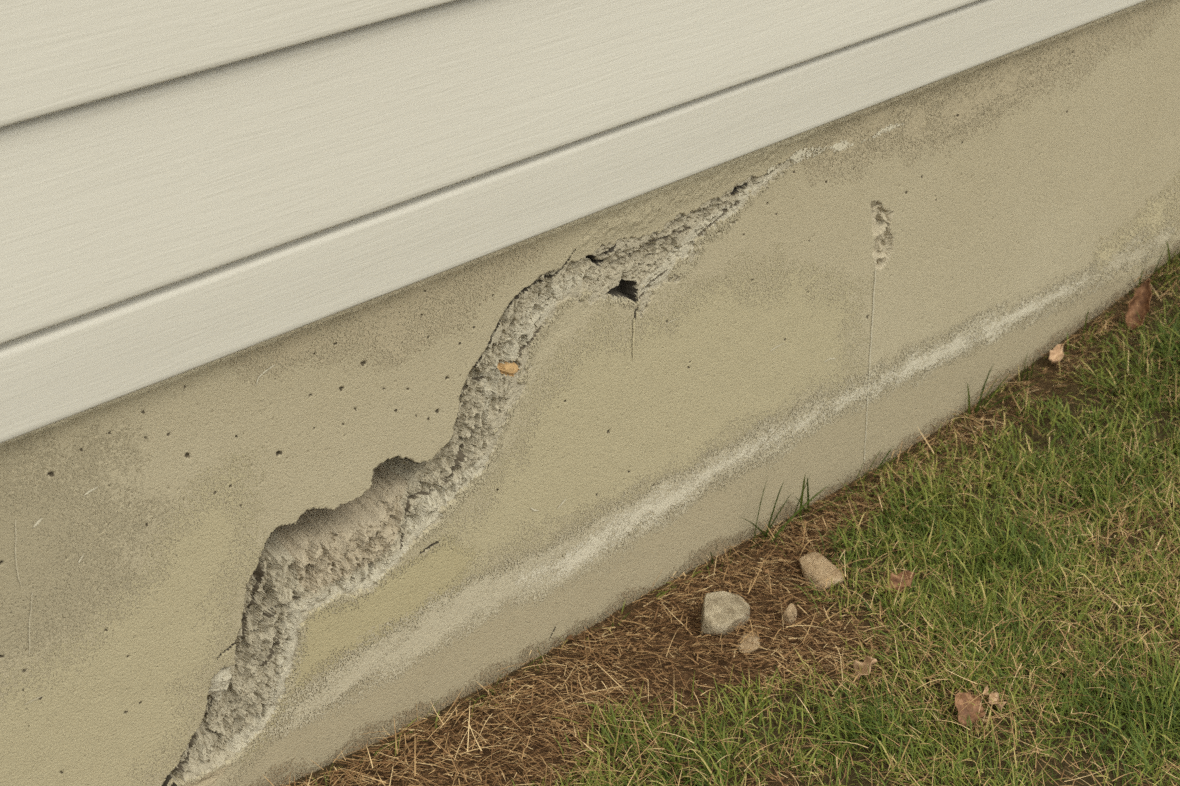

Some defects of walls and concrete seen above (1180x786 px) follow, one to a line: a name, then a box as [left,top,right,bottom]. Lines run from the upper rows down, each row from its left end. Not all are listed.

spalling [170,36,1075,784]
leakage [221,168,1180,786]